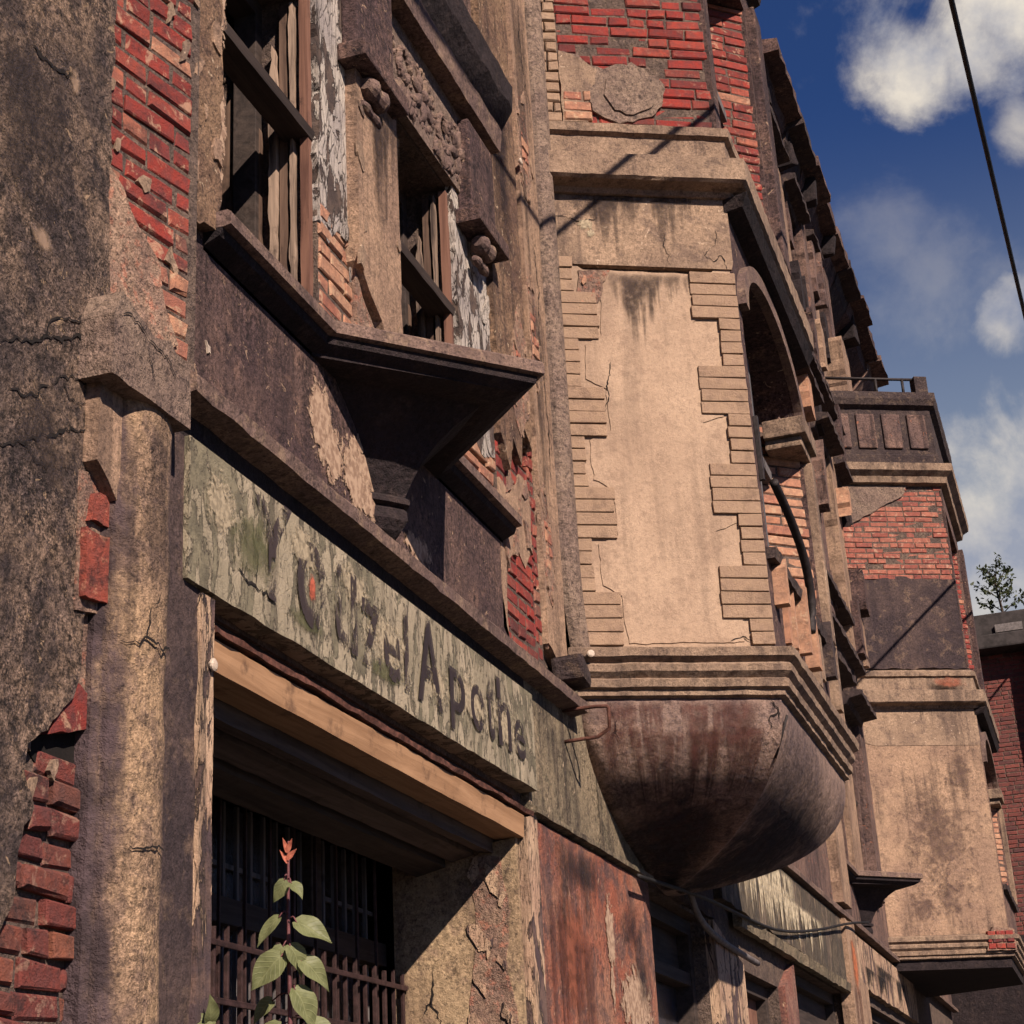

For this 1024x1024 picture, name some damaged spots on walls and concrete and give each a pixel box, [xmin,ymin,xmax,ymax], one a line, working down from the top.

flaking render [540,0,712,128]
flaking render [109,0,227,371]
crack [1,316,82,344]
peeling [480,295,490,325]
peeling [307,375,376,522]
crack [121,595,170,653]
peeling [404,531,433,570]
flaking render [463,431,591,691]
rust [607,705,761,796]
flaking render [0,742,81,1024]
flaking render [466,853,519,1024]
rust [551,900,597,1024]